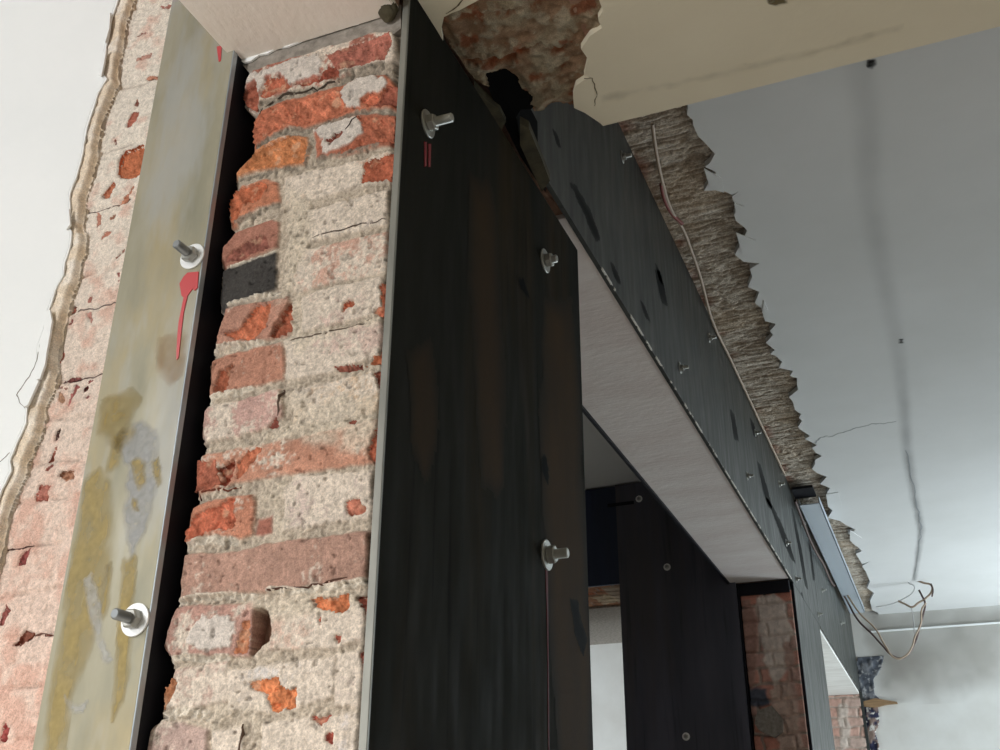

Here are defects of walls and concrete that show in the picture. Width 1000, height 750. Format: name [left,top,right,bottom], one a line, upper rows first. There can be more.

flaking render [442,0,601,111]
crack [259,81,340,114]
crack [312,218,385,238]
flaking render [0,0,147,574]
flaking render [618,105,873,611]
crack [815,421,896,444]
crack [905,450,922,580]
crack [266,577,347,591]
spalling [15,630,52,647]
spalling [0,723,10,742]